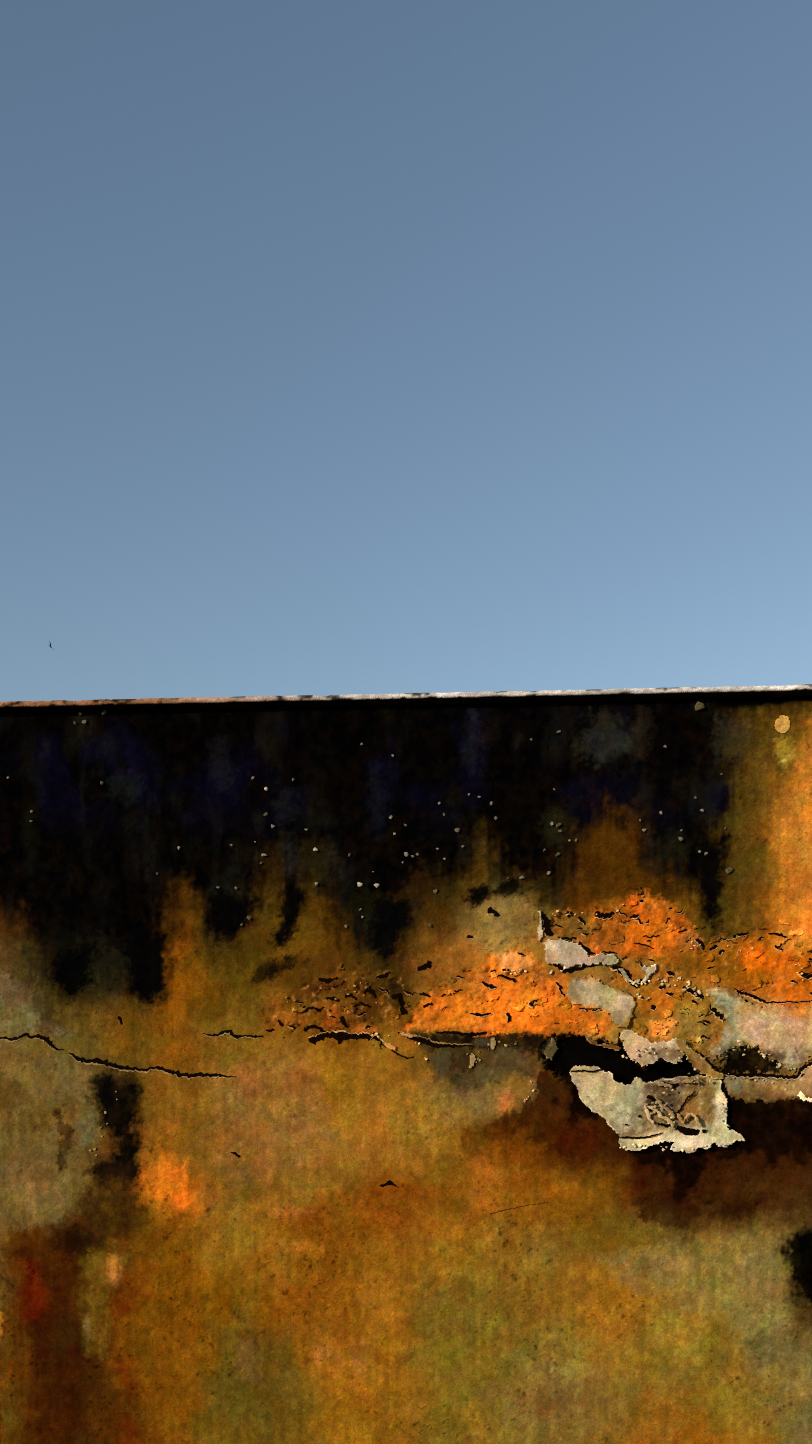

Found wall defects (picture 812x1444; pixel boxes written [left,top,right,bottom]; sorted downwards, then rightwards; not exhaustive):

rust [766,717,812,938]
crack [0,1033,236,1080]
crack [202,1030,263,1040]
crack [304,981,496,1060]
damp [0,696,812,1364]
flaking render [253,886,812,1153]
rust [0,1209,109,1444]
rust [139,1129,209,1227]
damp [203,1291,287,1444]
damp [407,1029,812,1444]